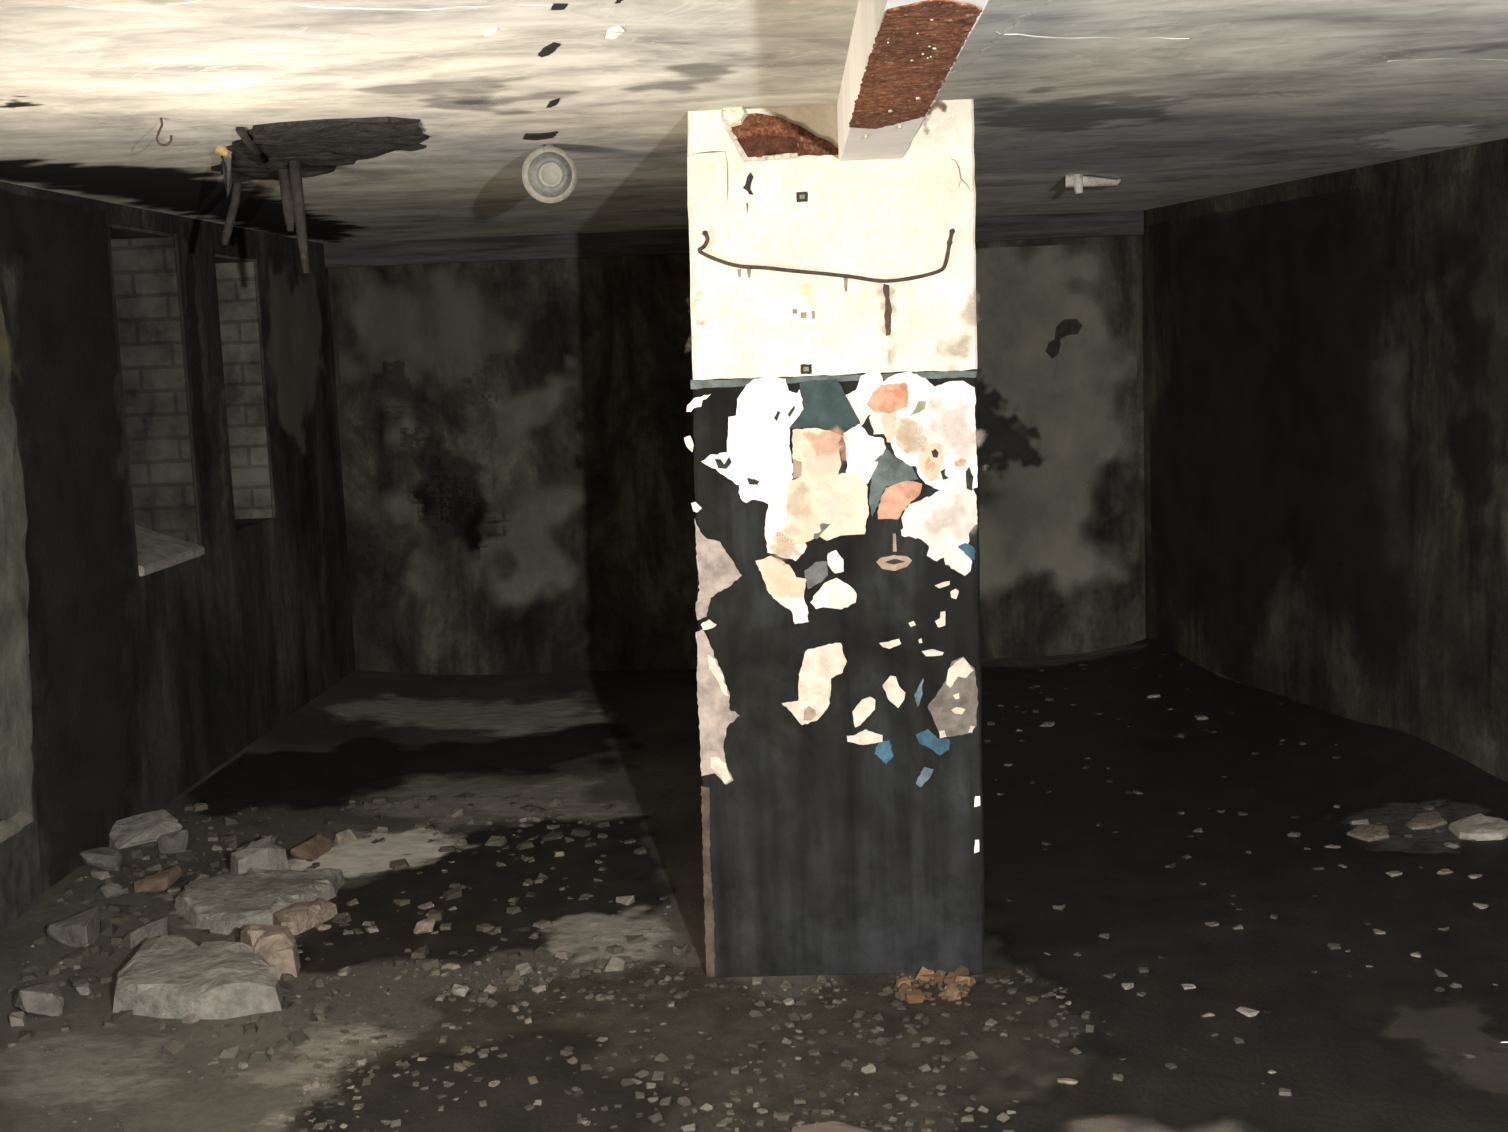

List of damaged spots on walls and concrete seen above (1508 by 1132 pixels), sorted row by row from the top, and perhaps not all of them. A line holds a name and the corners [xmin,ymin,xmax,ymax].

crack [951,0,1105,73]
peeling [691,502,742,784]
peeling [782,643,847,725]
peeling [847,676,905,745]
peeling [880,621,978,738]